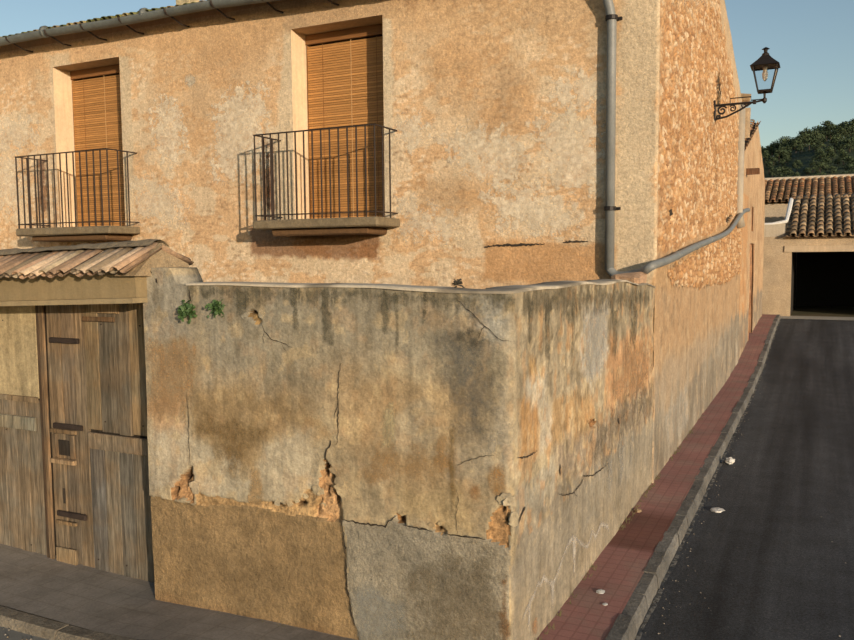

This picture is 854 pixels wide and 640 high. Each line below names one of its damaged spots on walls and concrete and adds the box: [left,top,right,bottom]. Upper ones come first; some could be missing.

water stain [236,287,333,345]
water stain [488,284,650,358]
crack [325,364,341,463]
peeling [169,459,349,522]
spalling [486,493,519,548]
crack [559,464,607,496]
water stain [524,524,608,621]